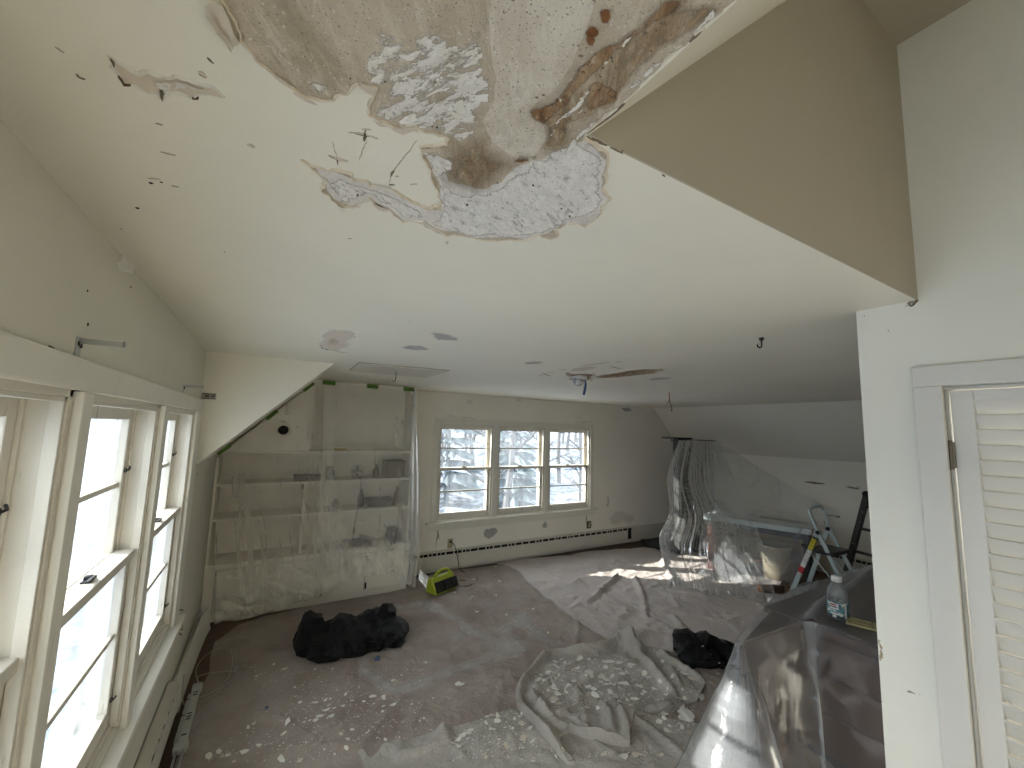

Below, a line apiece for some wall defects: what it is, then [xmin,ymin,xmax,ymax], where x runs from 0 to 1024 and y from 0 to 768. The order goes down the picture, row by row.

peeling [107,54,226,101]
peeling [205,0,735,242]
crack [332,128,378,161]
crack [389,141,417,185]
peeling [319,329,355,353]